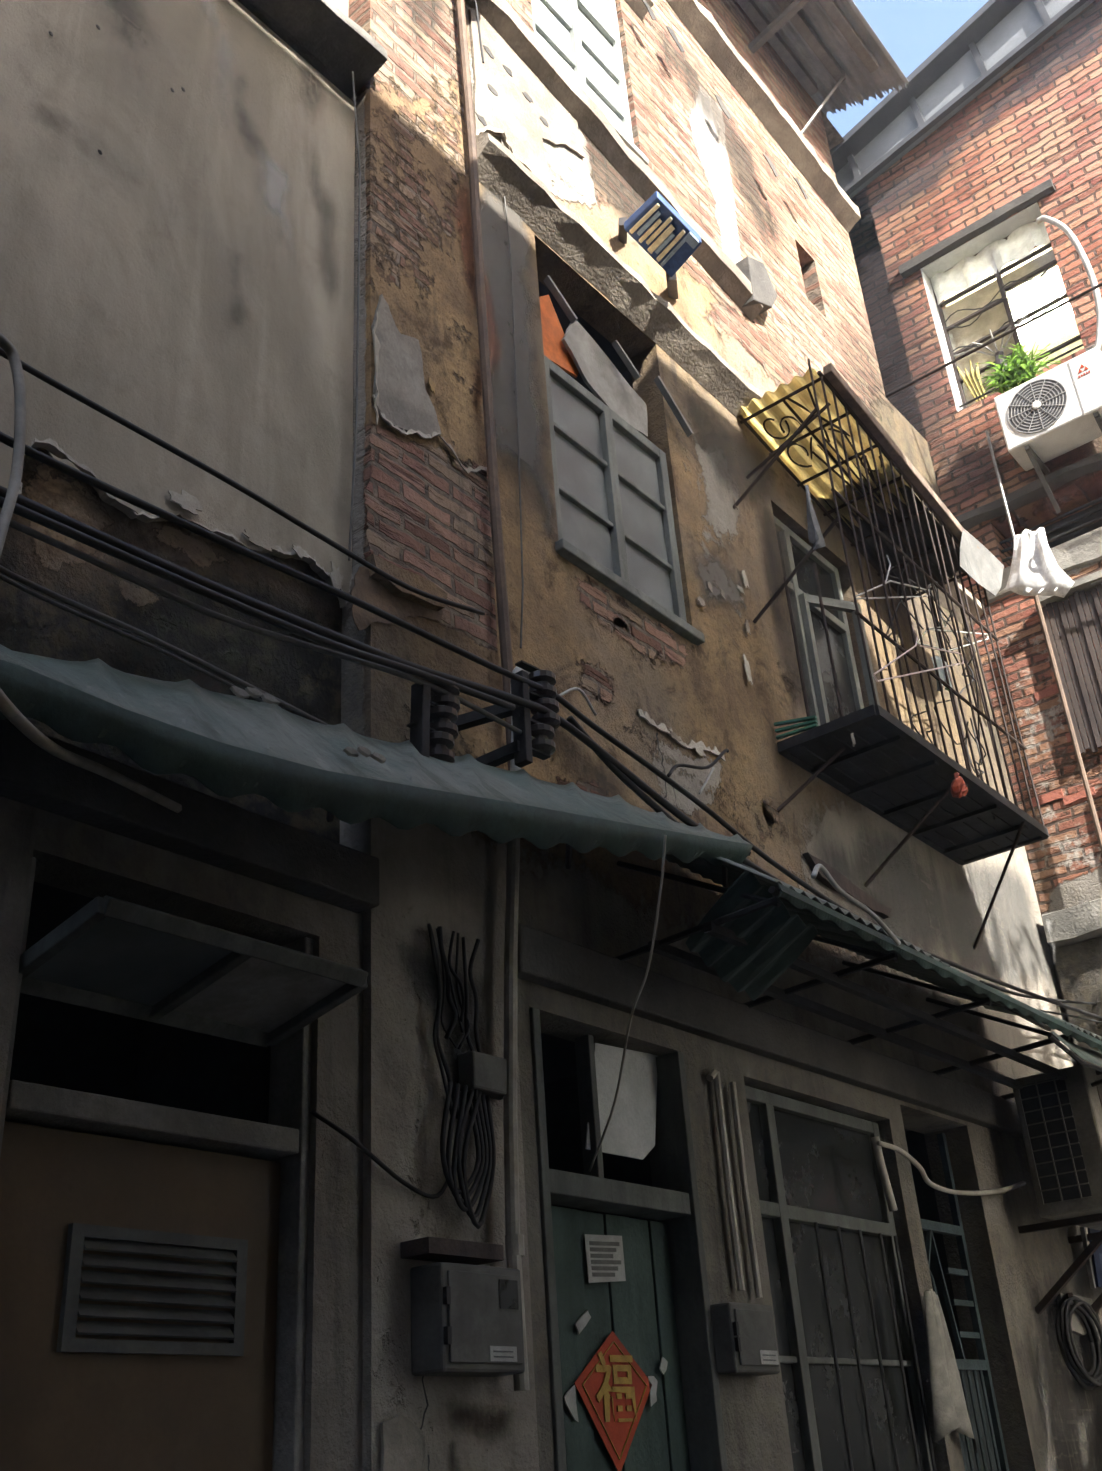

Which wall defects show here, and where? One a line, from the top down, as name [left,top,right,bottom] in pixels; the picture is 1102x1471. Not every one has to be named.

spalling [642,0,685,52]
peeling [468,8,585,195]
spalling [763,154,808,199]
spalling [18,294,493,631]
spalling [577,578,691,668]
spalling [623,709,786,850]